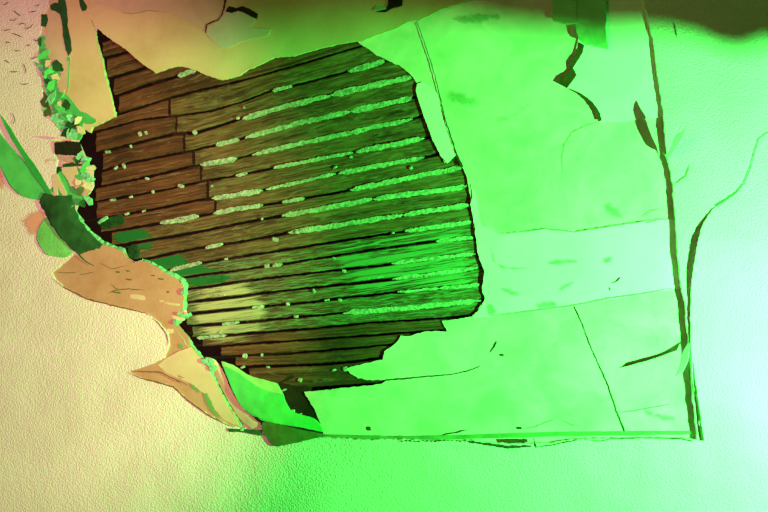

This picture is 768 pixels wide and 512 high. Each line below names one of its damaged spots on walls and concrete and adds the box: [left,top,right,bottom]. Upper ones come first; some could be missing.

flaking render [34,0,96,142]
crack [556,42,602,168]
crack [715,133,767,206]
peeling [0,115,324,433]
crack [445,277,704,449]